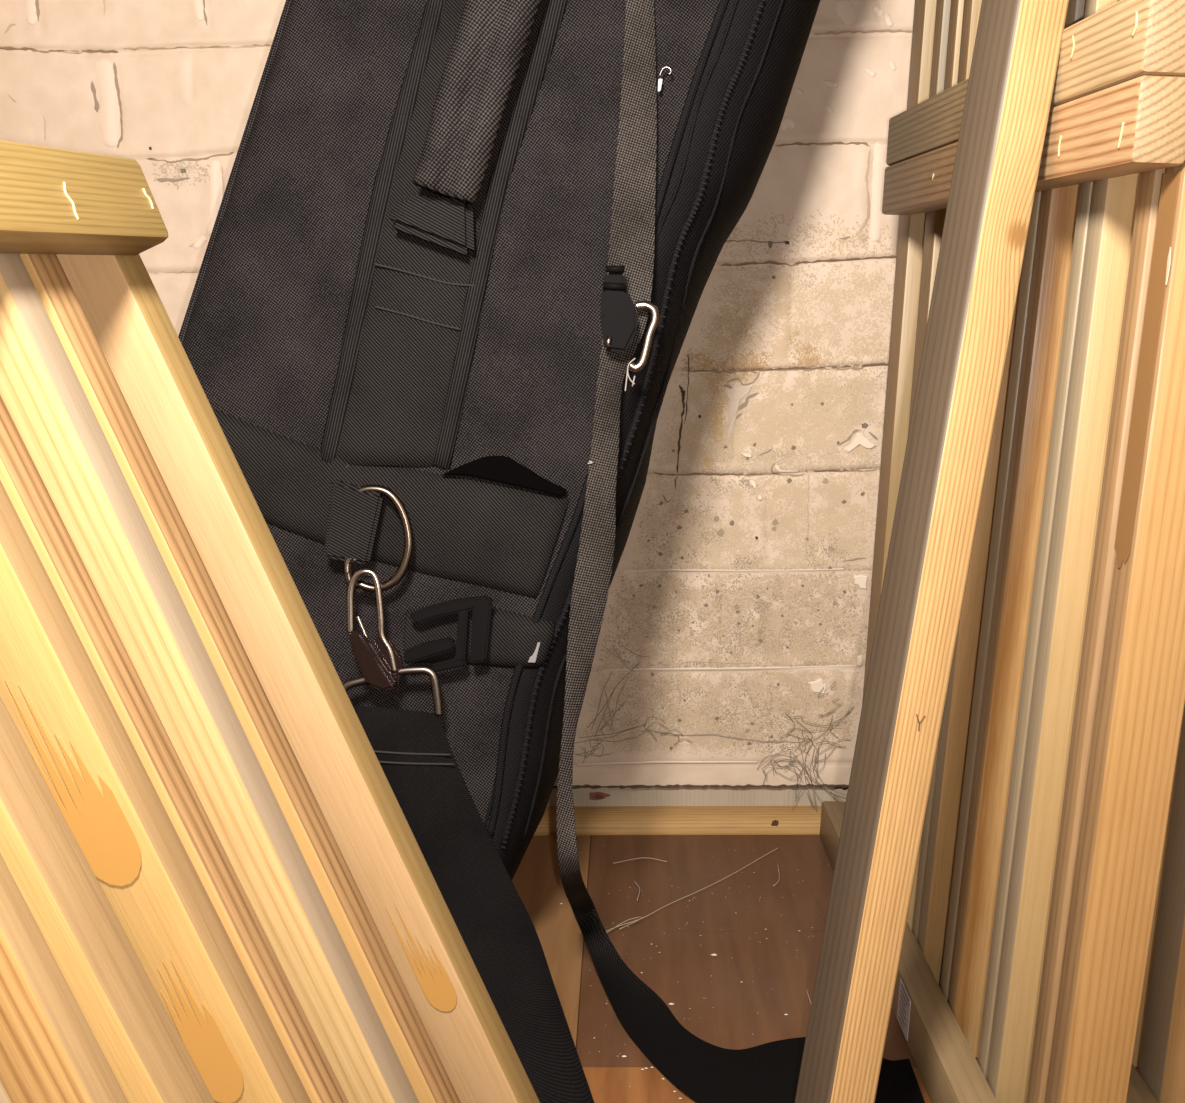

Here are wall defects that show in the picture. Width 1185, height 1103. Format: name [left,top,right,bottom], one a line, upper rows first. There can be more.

crack [647,729,800,743]
crack [553,782,849,790]